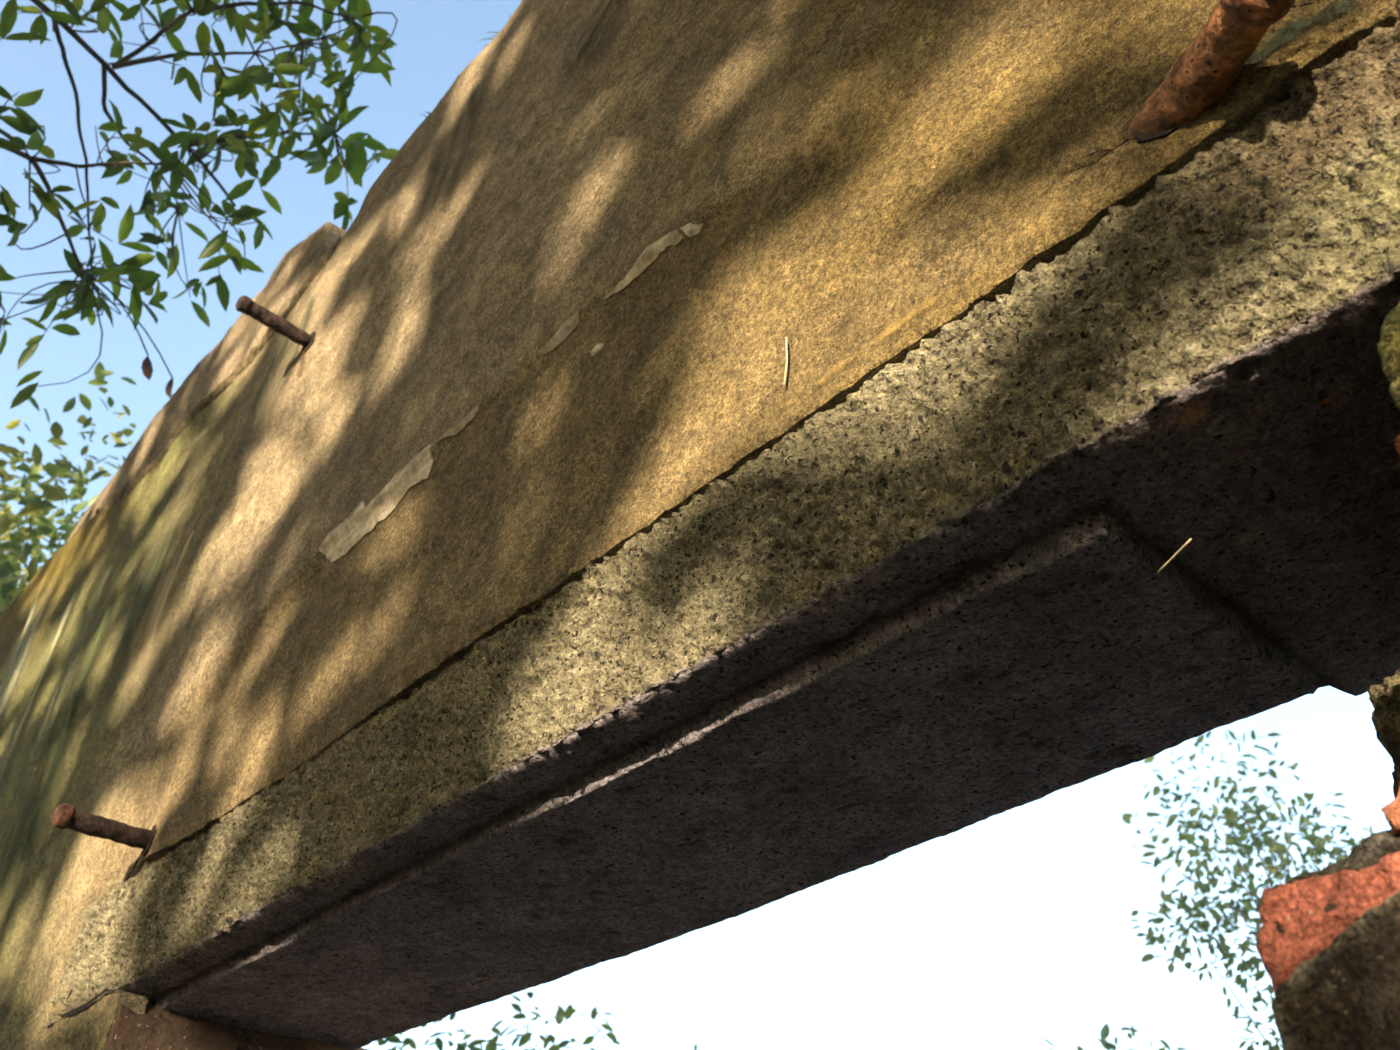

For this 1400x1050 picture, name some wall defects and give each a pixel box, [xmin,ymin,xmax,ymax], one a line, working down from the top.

peeling [603,223,703,300]
peeling [536,309,581,355]
peeling [319,403,480,564]